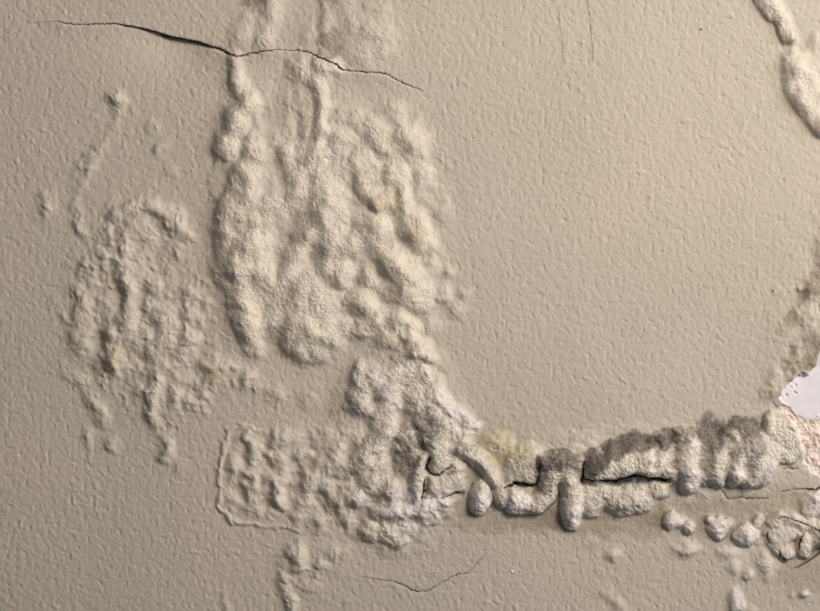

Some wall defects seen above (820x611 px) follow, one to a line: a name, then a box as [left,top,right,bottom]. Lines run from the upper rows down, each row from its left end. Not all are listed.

crack [43,21,423,91]
peeling [759,234,820,477]
crack [503,464,541,488]
crack [582,461,670,482]